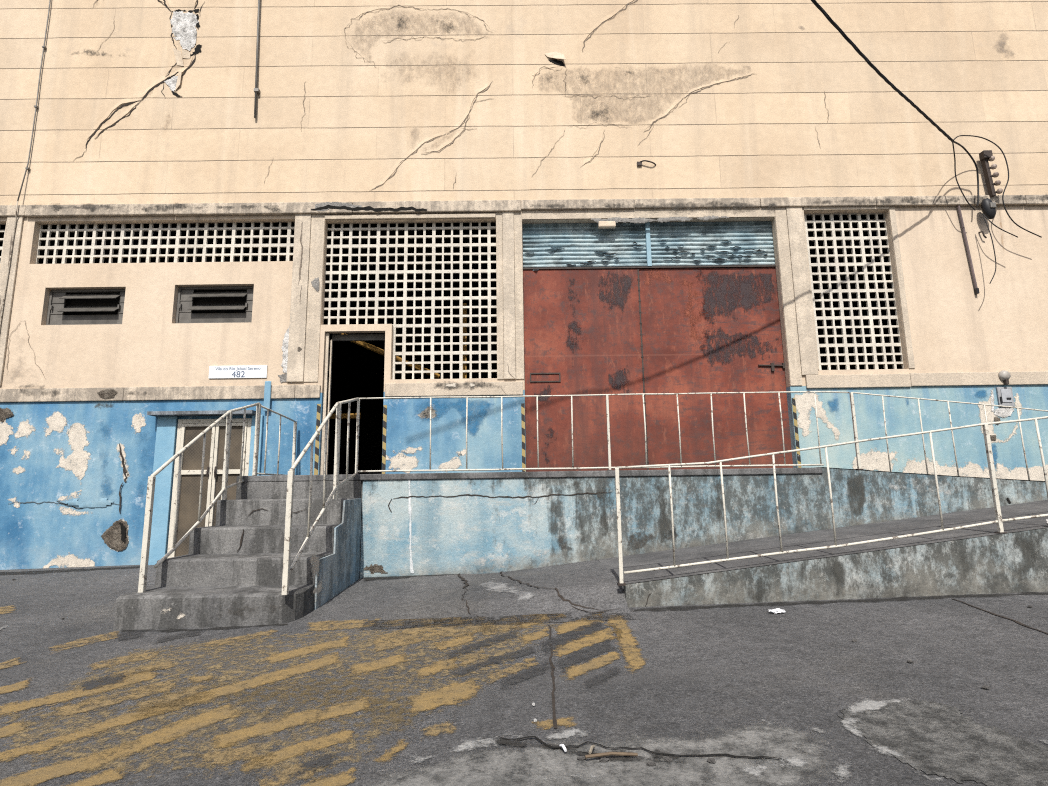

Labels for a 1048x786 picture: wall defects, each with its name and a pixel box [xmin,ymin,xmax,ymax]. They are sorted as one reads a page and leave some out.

crack [73,0,205,161]
crack [368,80,493,191]
peeling [0,408,92,516]
peeling [852,448,1048,481]
spalling [101,443,130,551]
crack [388,491,613,512]
leakage [848,474,866,515]
leakage [628,504,677,549]
peeling [43,552,95,568]
leakage [364,564,388,574]
leakage [833,562,844,593]
crack [498,736,791,763]